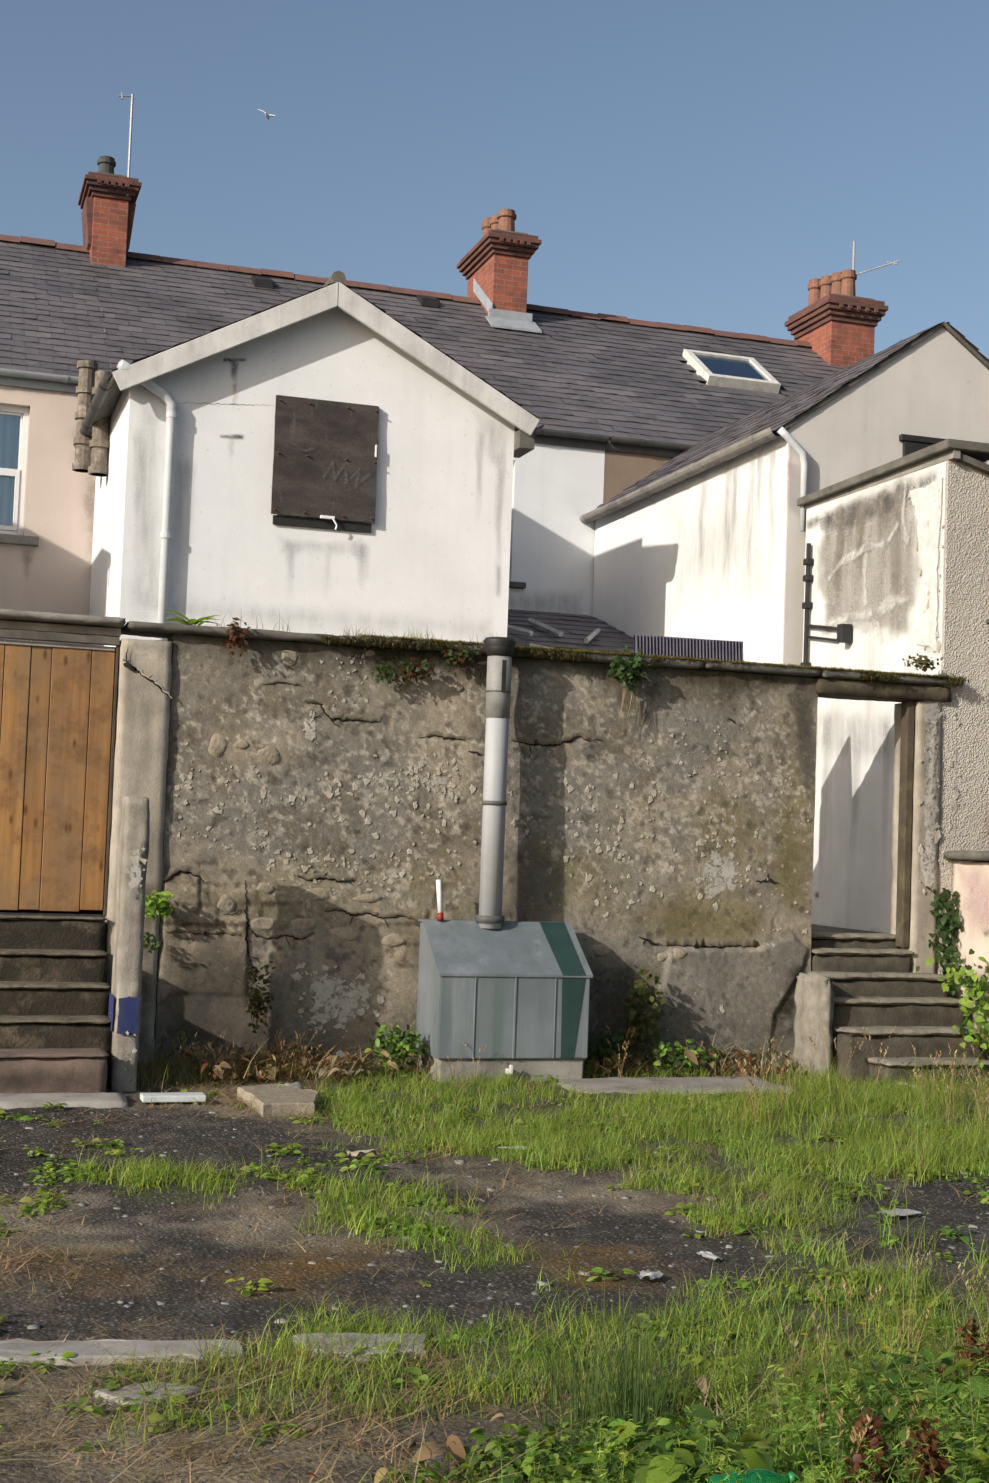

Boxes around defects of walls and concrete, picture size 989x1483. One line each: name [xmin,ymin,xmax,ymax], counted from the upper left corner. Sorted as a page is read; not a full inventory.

damp [821,485,913,630]
crack [123,649,172,699]
crack [257,679,381,726]
crack [419,731,601,757]
crack [162,864,415,1002]